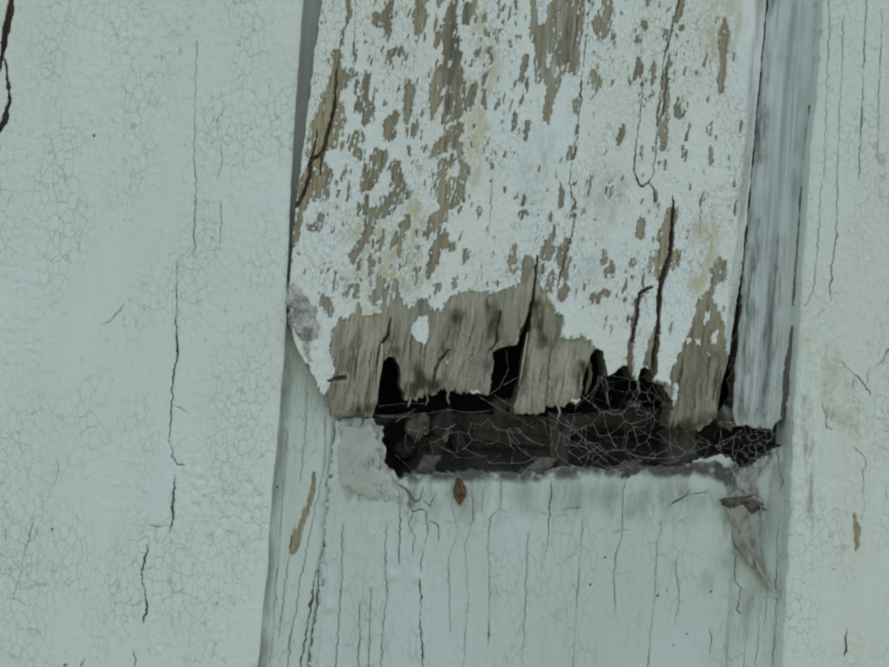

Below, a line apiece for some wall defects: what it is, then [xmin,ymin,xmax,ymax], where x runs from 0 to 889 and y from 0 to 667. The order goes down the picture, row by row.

peeling [285,0,685,418]
peeling [628,18,735,171]
crack [804,0,883,315]
peeling [654,258,728,431]
crack [834,349,889,397]
peeling [289,471,316,556]
crack [269,390,505,667]
crack [521,484,583,667]
crack [613,481,626,614]
peeling [853,512,861,552]